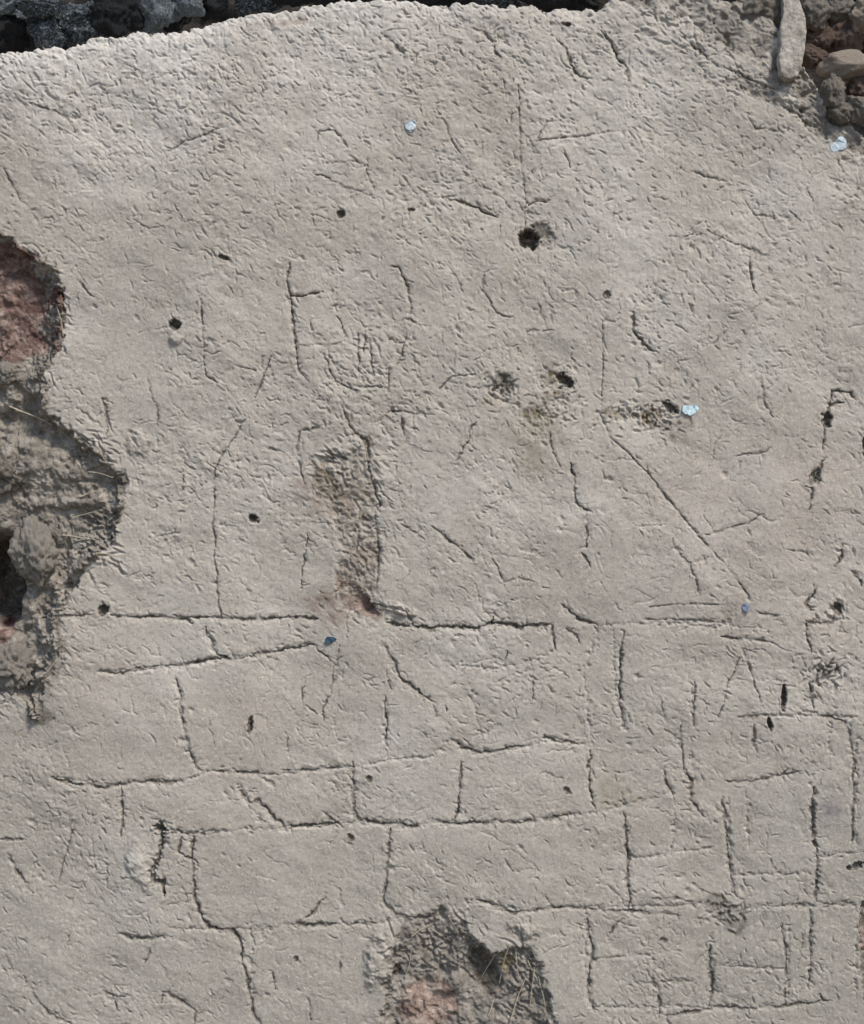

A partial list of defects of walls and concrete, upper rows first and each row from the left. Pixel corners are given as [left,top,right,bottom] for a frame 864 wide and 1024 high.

flaking render [0,230,127,724]
crack [808,390,853,510]
crack [102,426,340,761]
crack [375,537,593,647]
crack [53,777,168,836]
crack [174,829,276,1022]
crack [221,767,430,927]
crack [384,657,447,751]
flaking render [381,905,554,1024]
crack [443,743,566,825]
crack [476,815,689,1010]
crack [647,682,856,1016]